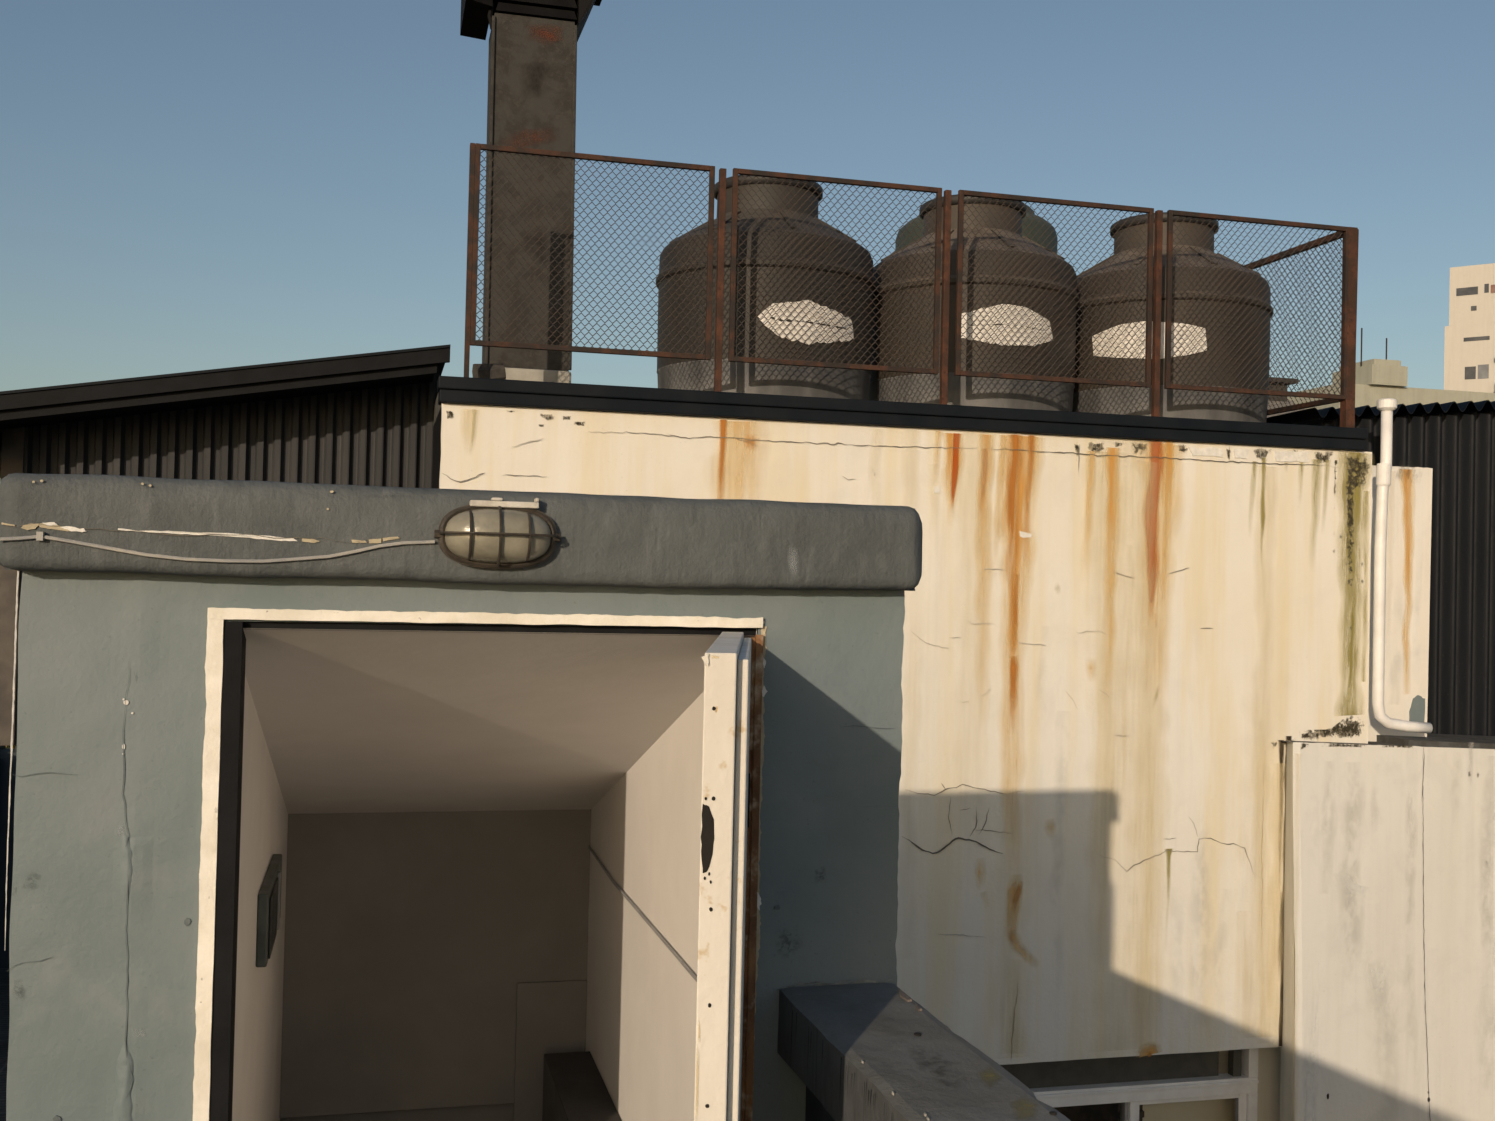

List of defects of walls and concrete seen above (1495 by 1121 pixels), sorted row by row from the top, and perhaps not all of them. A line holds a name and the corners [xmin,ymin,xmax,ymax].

rust [719,420,754,488]
rust [946,433,961,501]
rust [979,434,1035,705]
rust [1145,441,1173,606]
rust [1403,469,1412,608]
damp [1349,599,1366,686]
spalling [701,797,714,884]
crack [903,783,1020,854]
crack [1101,761,1265,929]
rust [1008,883,1024,955]